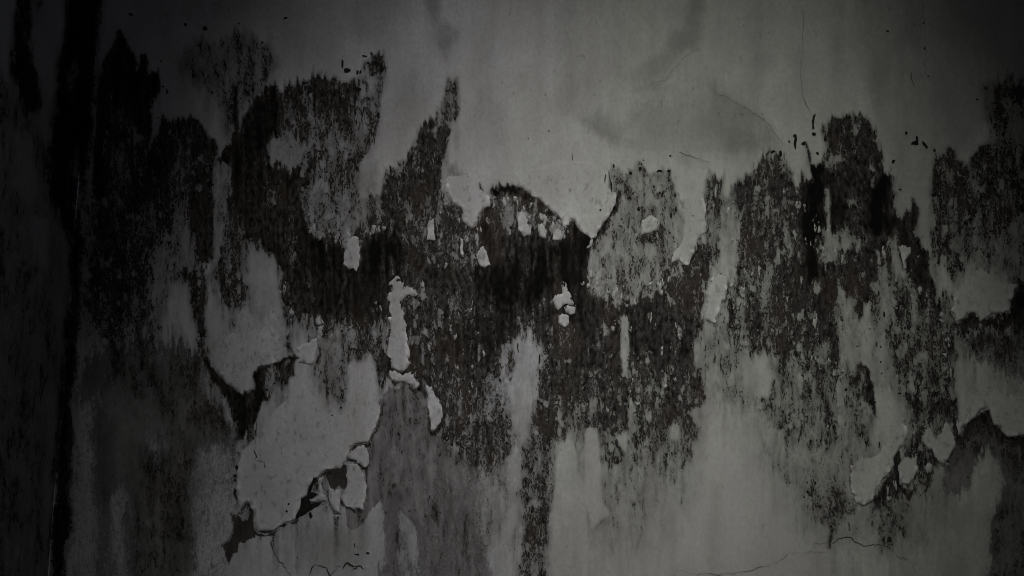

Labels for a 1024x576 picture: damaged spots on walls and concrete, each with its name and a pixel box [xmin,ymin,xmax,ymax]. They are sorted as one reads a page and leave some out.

peeling [770,114,827,157]
peeling [306,213,386,272]
peeling [423,156,616,281]
peeling [637,185,738,266]
peeling [783,188,859,266]
damp [0,0,732,576]
peeling [552,283,576,327]
peeling [581,268,670,308]
peeling [705,259,773,324]
peeling [918,263,1017,378]
peeling [213,276,493,576]
spalling [850,385,1024,576]